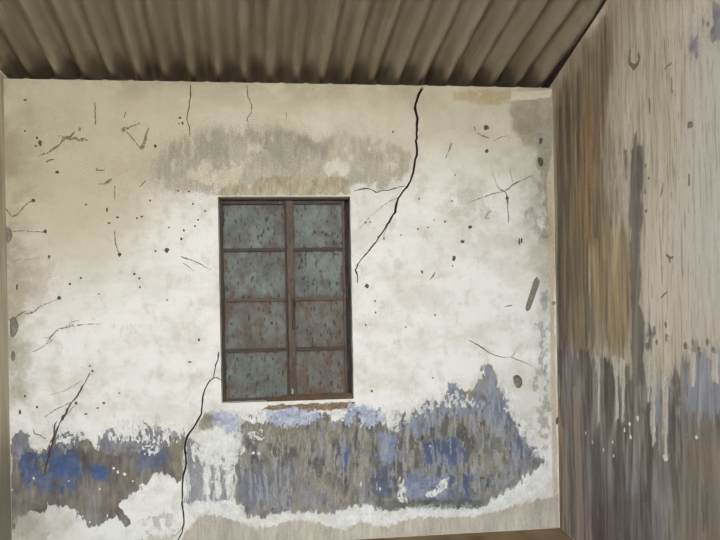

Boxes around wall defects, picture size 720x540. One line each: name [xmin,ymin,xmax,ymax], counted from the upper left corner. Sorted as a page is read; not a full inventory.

water stain [88,120,412,199]
crack [355,89,423,283]
crack [471,171,530,222]
crack [34,320,91,352]
peeling [10,150,559,530]
water stain [141,133,720,540]
crack [469,340,530,365]
crack [33,373,90,476]
crack [175,352,221,540]